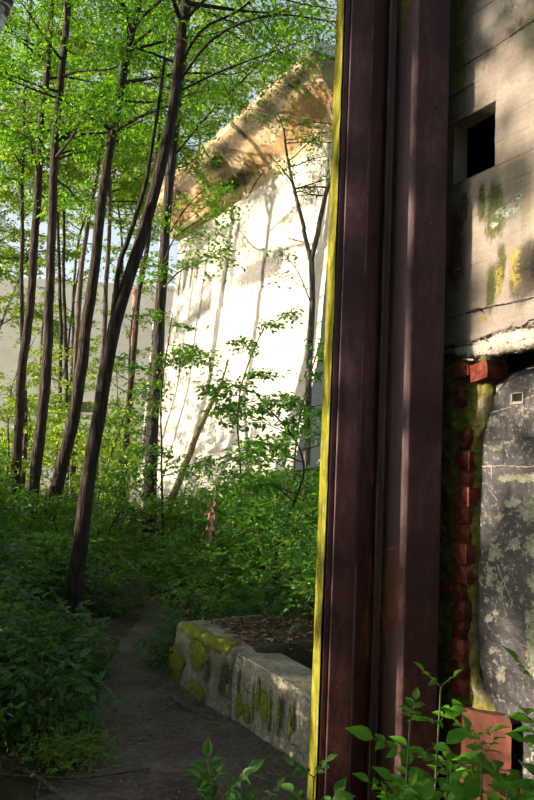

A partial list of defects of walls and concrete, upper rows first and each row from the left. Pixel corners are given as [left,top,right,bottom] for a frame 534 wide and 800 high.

leakage [478,182,505,240]
leakage [448,194,468,288]
leakage [478,241,534,322]
leakage [204,659,241,696]
leakage [279,699,296,731]